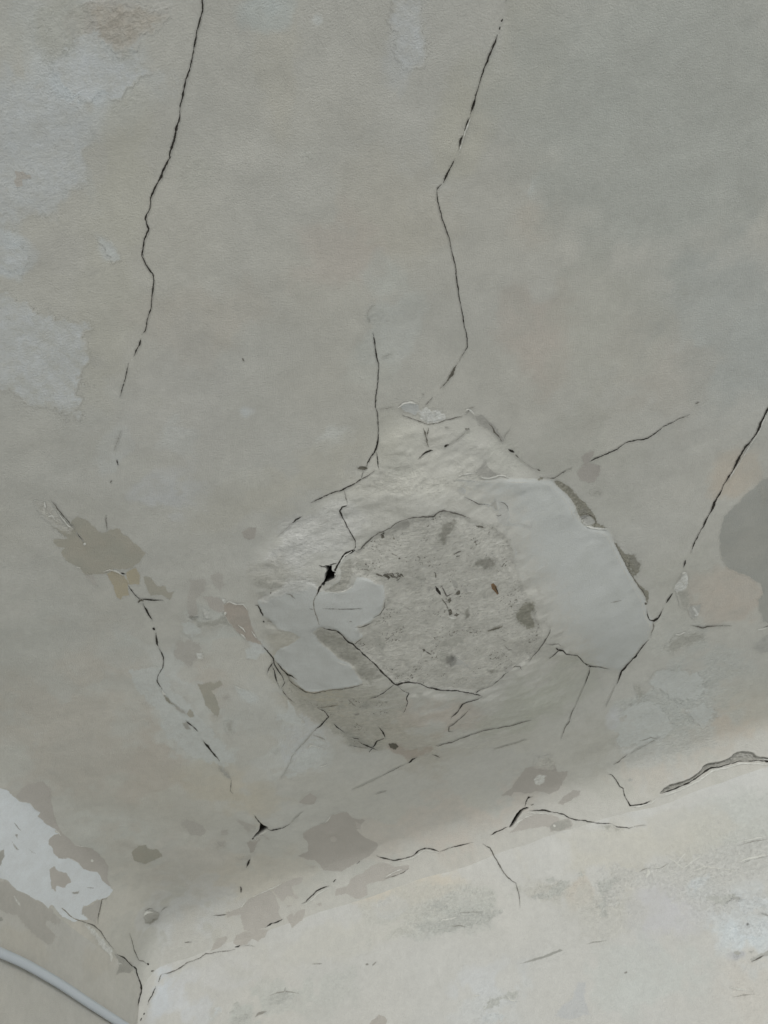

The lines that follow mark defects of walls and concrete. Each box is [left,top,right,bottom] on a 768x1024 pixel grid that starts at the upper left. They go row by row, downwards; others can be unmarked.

crack [120,0,204,397]
crack [418,0,507,459]
flaking render [189,499,549,773]
flaking render [380,401,510,444]
crack [255,305,699,795]
flaking render [537,476,606,529]
flaking render [614,542,649,605]
crack [683,407,768,567]
peeling [0,788,134,975]
crack [62,879,336,1021]
peeling [210,812,409,952]
crack [356,736,661,908]